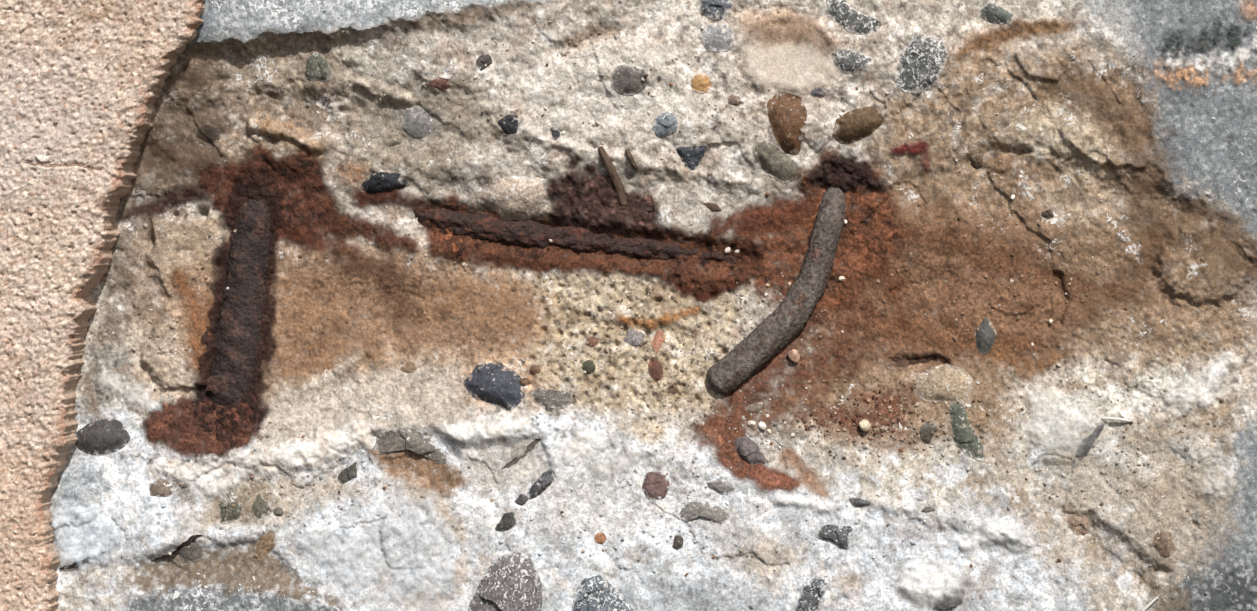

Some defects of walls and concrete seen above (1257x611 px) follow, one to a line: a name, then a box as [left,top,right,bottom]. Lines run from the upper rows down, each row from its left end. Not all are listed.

corrosion [957,21,1068,57]
spalling [716,228,744,243]
corrosion [124,141,1117,495]
spalling [790,306,845,371]